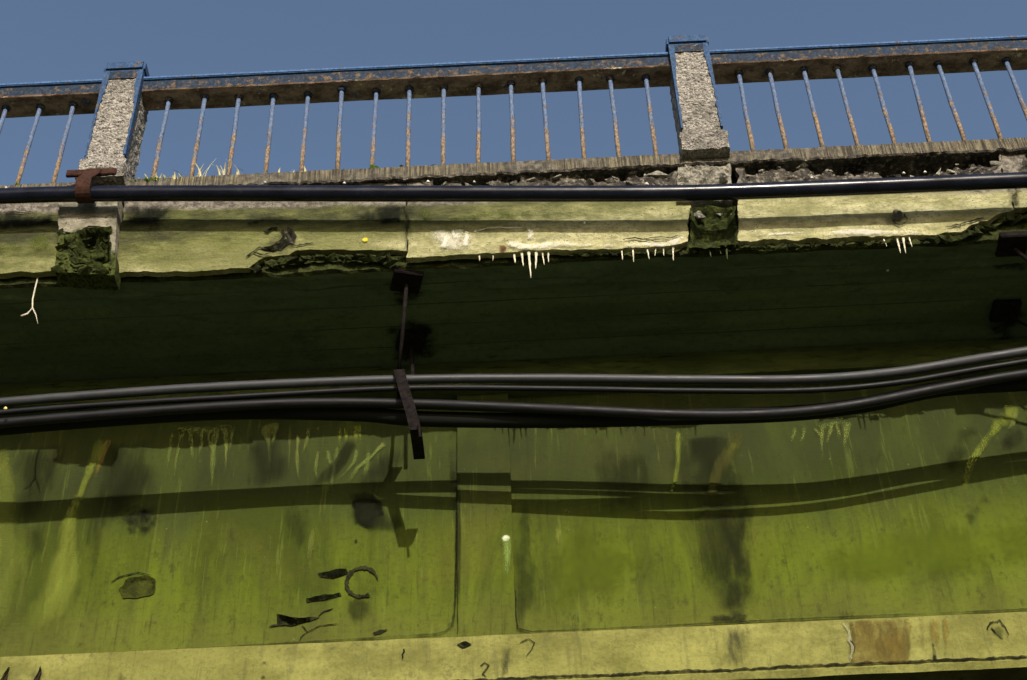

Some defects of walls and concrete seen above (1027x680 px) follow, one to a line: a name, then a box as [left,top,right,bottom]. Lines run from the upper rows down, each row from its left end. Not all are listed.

spalling [430,153,1003,186]
crack [946,217,984,227]
spalling [0,200,1027,310]
leakage [169,426,233,471]
leakage [315,425,384,484]
leakage [713,612,745,645]
crack [456,623,1027,680]